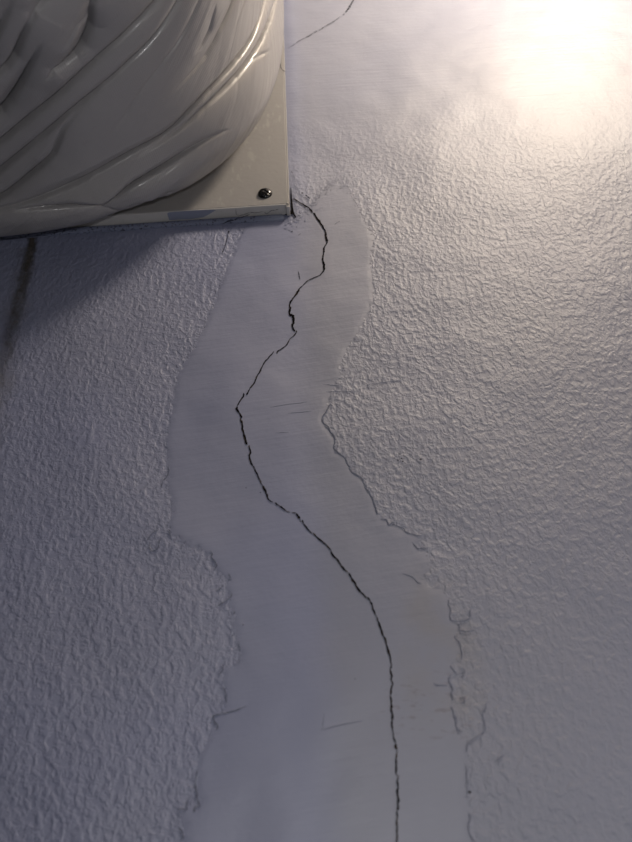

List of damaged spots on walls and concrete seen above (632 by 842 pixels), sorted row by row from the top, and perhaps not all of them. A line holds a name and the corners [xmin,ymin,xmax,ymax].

crack [222,199,400,842]
peeling [322,404,425,550]